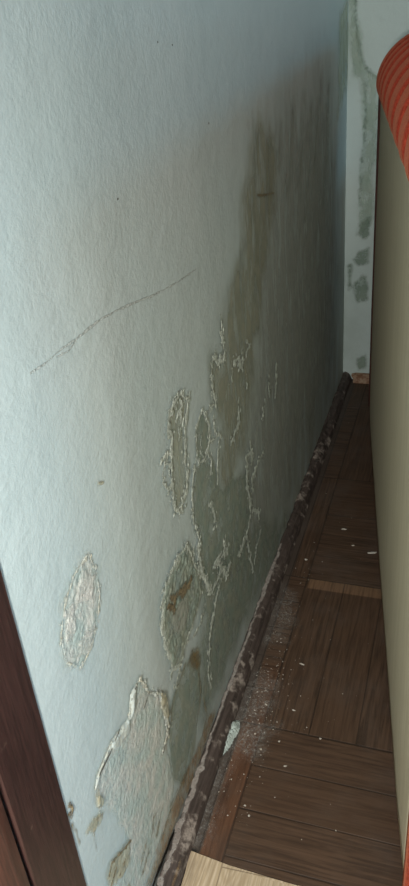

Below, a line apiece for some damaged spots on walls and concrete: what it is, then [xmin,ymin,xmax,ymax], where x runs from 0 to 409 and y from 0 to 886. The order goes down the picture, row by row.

damp [339,0,378,238]
damp [160,126,279,783]
peeling [87,543,282,886]